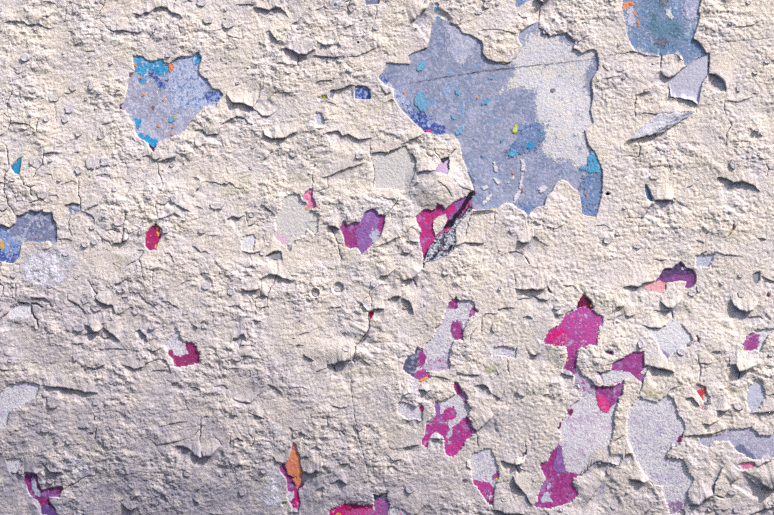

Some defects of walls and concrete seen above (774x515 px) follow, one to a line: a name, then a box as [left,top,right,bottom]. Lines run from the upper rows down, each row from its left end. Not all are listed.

peeling [3,0,59,31]
peeling [203,0,374,74]
peeling [11,158,34,174]
crack [3,92,44,213]
peeling [102,53,294,182]
crack [0,262,43,328]
peeling [0,285,53,319]
peeling [0,165,246,278]
peeling [67,285,206,390]
crack [334,288,373,484]
peeling [215,0,774,515]
peeling [7,458,63,515]